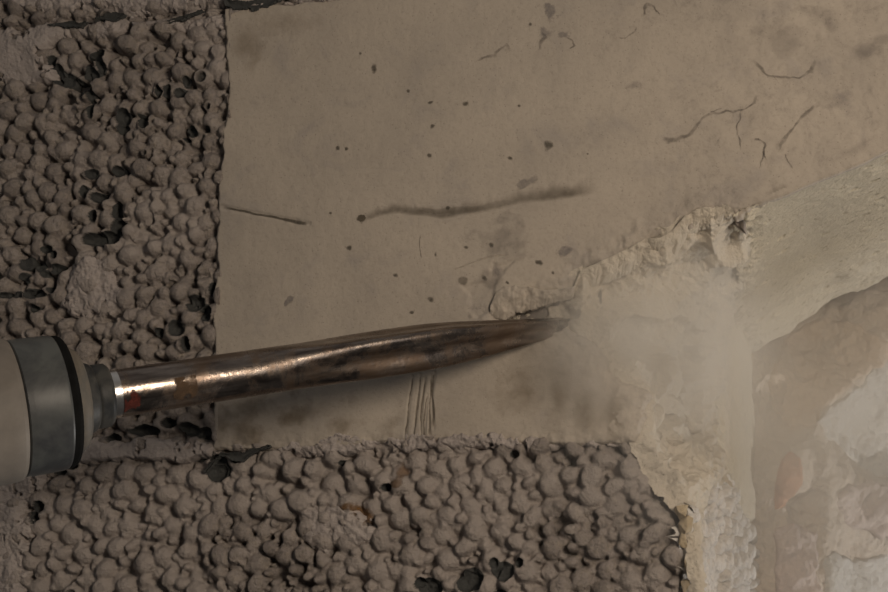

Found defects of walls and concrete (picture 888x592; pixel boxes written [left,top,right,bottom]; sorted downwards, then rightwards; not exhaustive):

crack [230,208,305,224]
spalling [490,204,752,592]